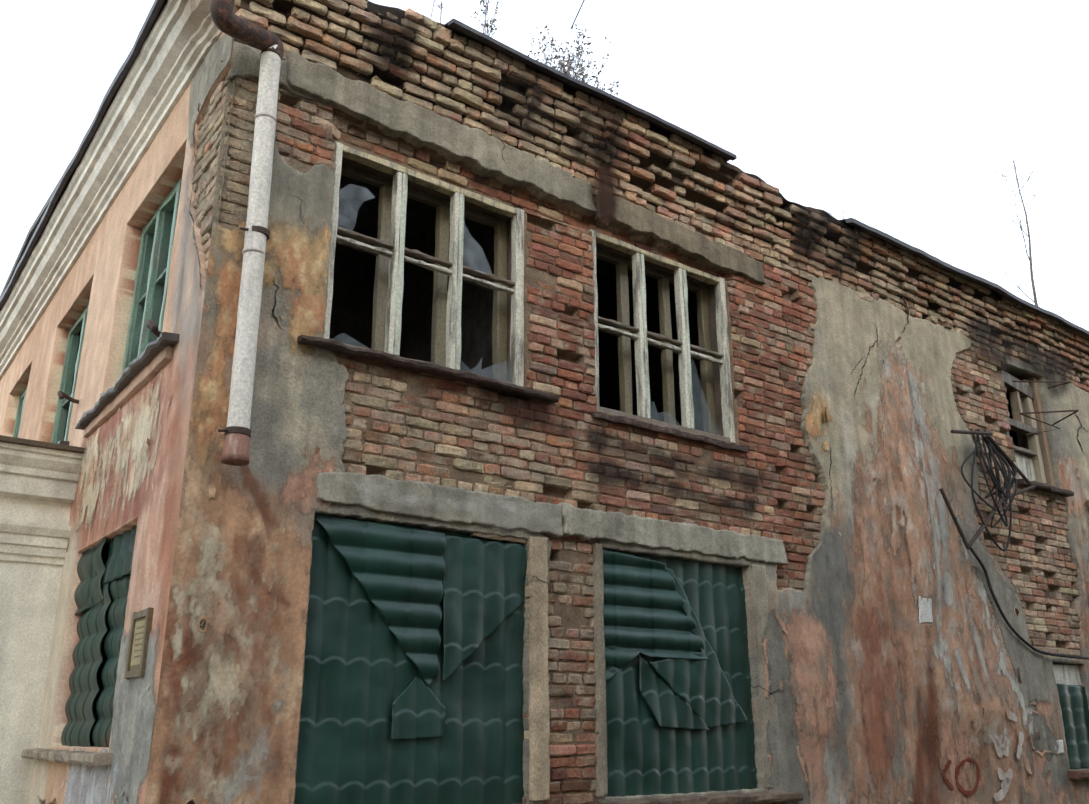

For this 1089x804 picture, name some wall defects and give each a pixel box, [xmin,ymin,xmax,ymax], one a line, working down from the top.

water stain [576,113,620,160]
crack [189,146,202,296]
peeling [39,69,336,804]
flaking render [275,86,1089,804]
crack [851,296,910,452]